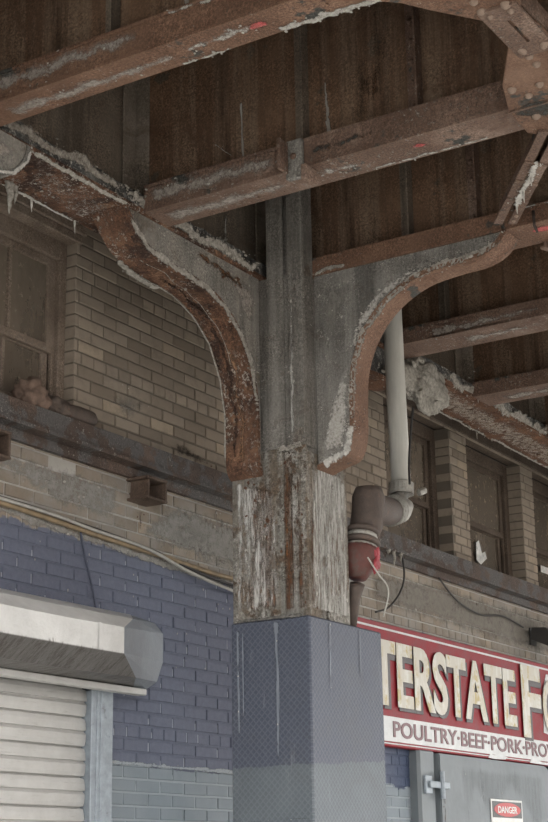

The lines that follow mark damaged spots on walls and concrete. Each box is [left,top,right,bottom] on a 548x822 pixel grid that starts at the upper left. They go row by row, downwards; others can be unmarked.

leakage [0,122,260,464]
efflorescence [439,411,548,469]
efflorescence [492,389,548,436]
rust [244,457,318,610]